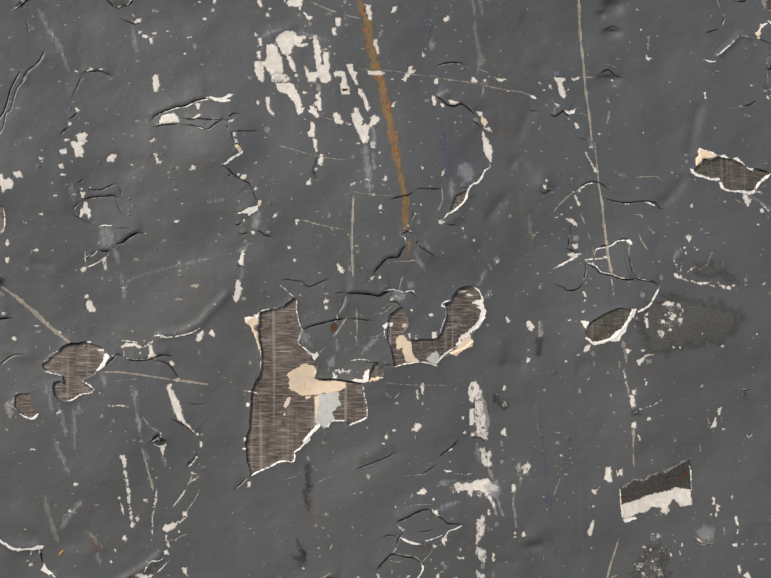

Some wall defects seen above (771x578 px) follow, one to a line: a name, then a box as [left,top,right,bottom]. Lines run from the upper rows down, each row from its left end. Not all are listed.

crack [0,0,163,137]
peeling [247,0,381,185]
corrosion [356,0,410,230]
crack [553,160,670,294]
peeling [684,145,771,213]
peeling [4,317,117,426]
peeling [232,245,493,504]
peeling [568,275,683,440]
peeling [135,378,209,541]
crack [352,433,396,470]
crack [382,414,495,563]
peeling [603,458,692,522]